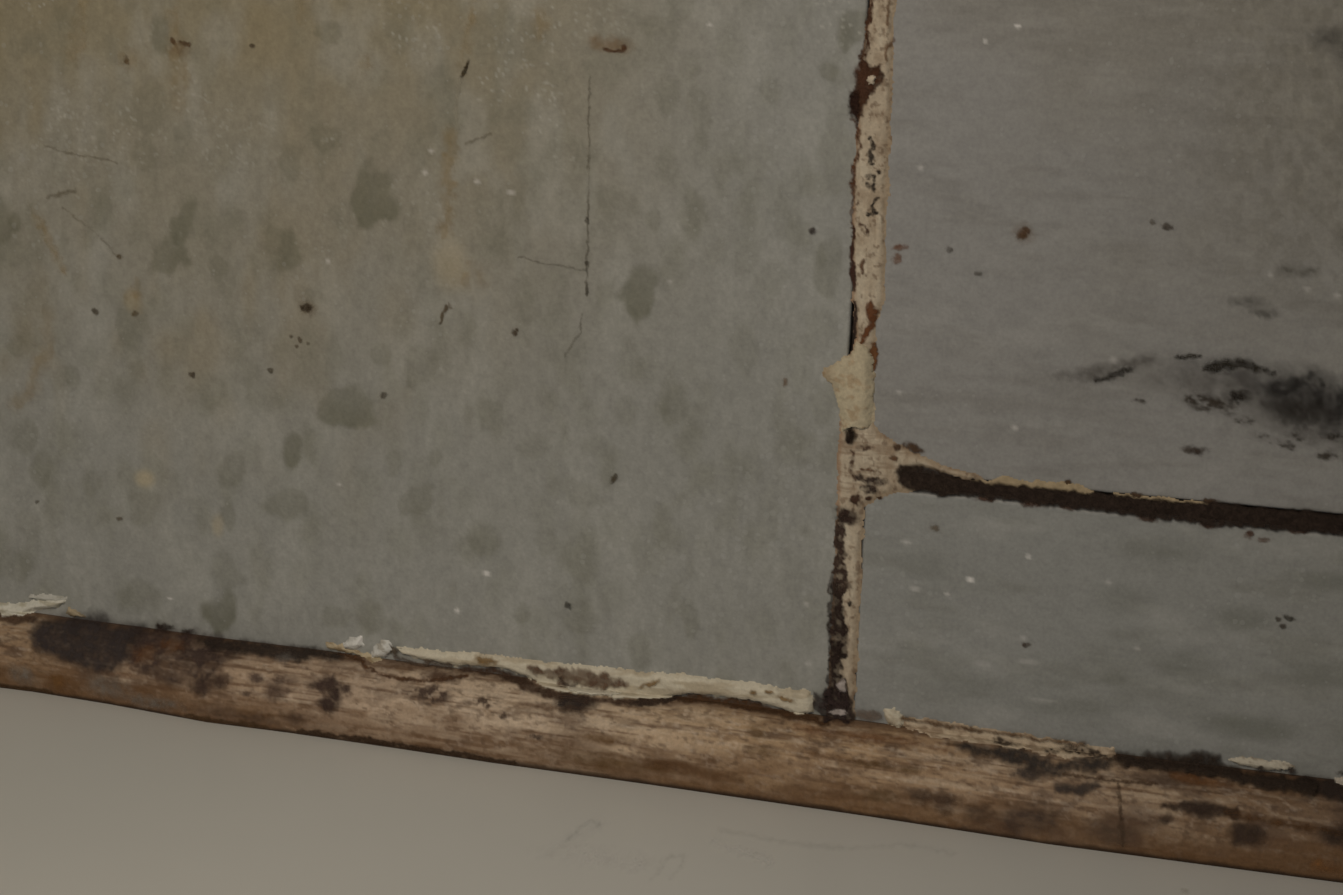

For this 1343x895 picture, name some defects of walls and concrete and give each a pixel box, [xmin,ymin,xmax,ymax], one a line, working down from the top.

leakage [1175,354,1343,423]
peeling [0,593,86,618]
leakage [0,615,342,696]
leakage [315,676,350,712]
leakage [394,655,680,711]
peeling [326,636,814,715]
leakage [960,737,1343,800]
leakage [1161,801,1343,844]